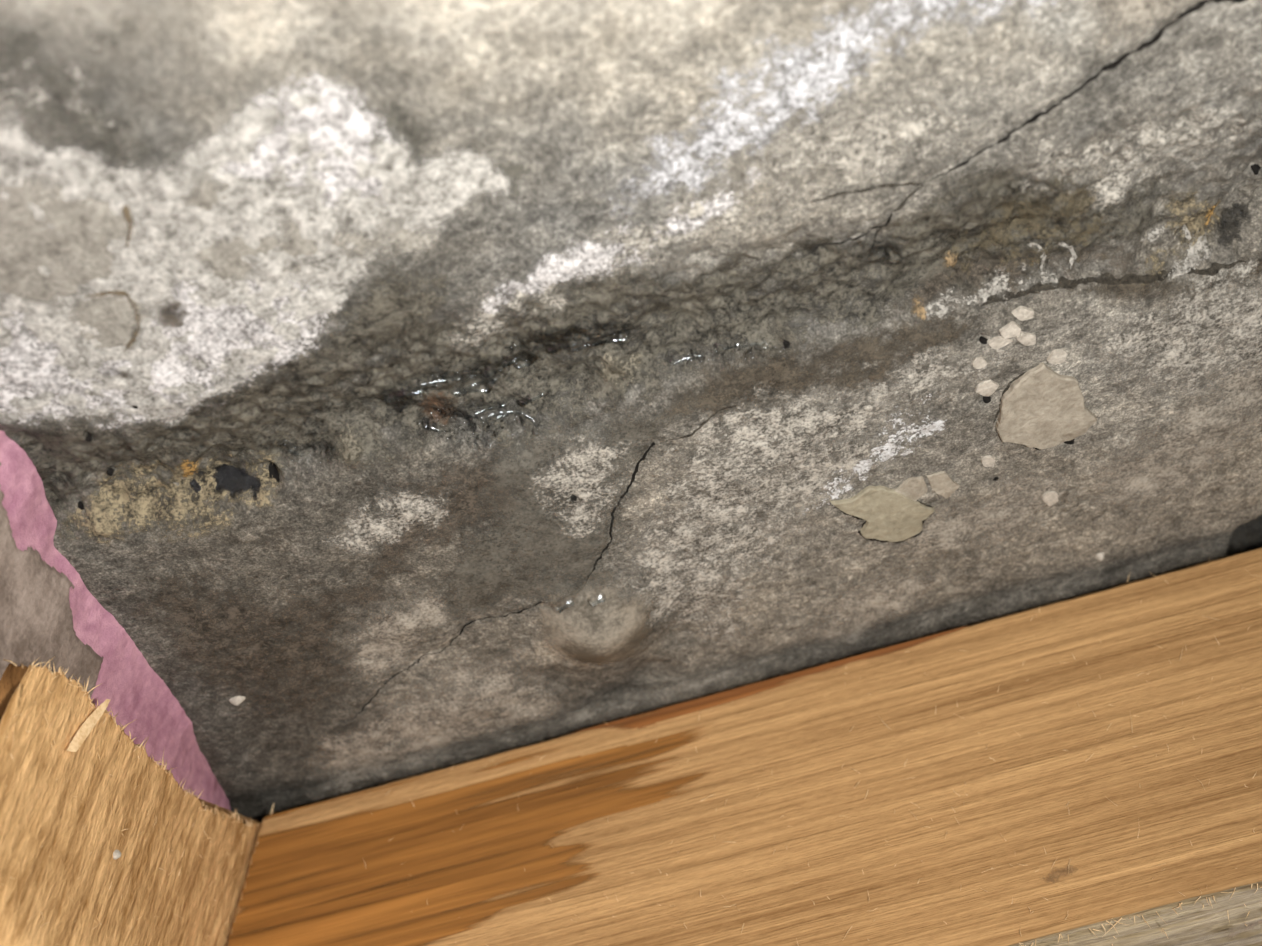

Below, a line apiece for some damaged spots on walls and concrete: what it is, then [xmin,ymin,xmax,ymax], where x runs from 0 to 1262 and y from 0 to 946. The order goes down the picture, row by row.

crack [808,0,1246,255]
damp [0,0,1262,714]
peeling [972,306,1097,450]
crack [581,405,739,589]
peeling [830,471,960,543]
crack [352,602,553,720]
damp [229,568,966,946]